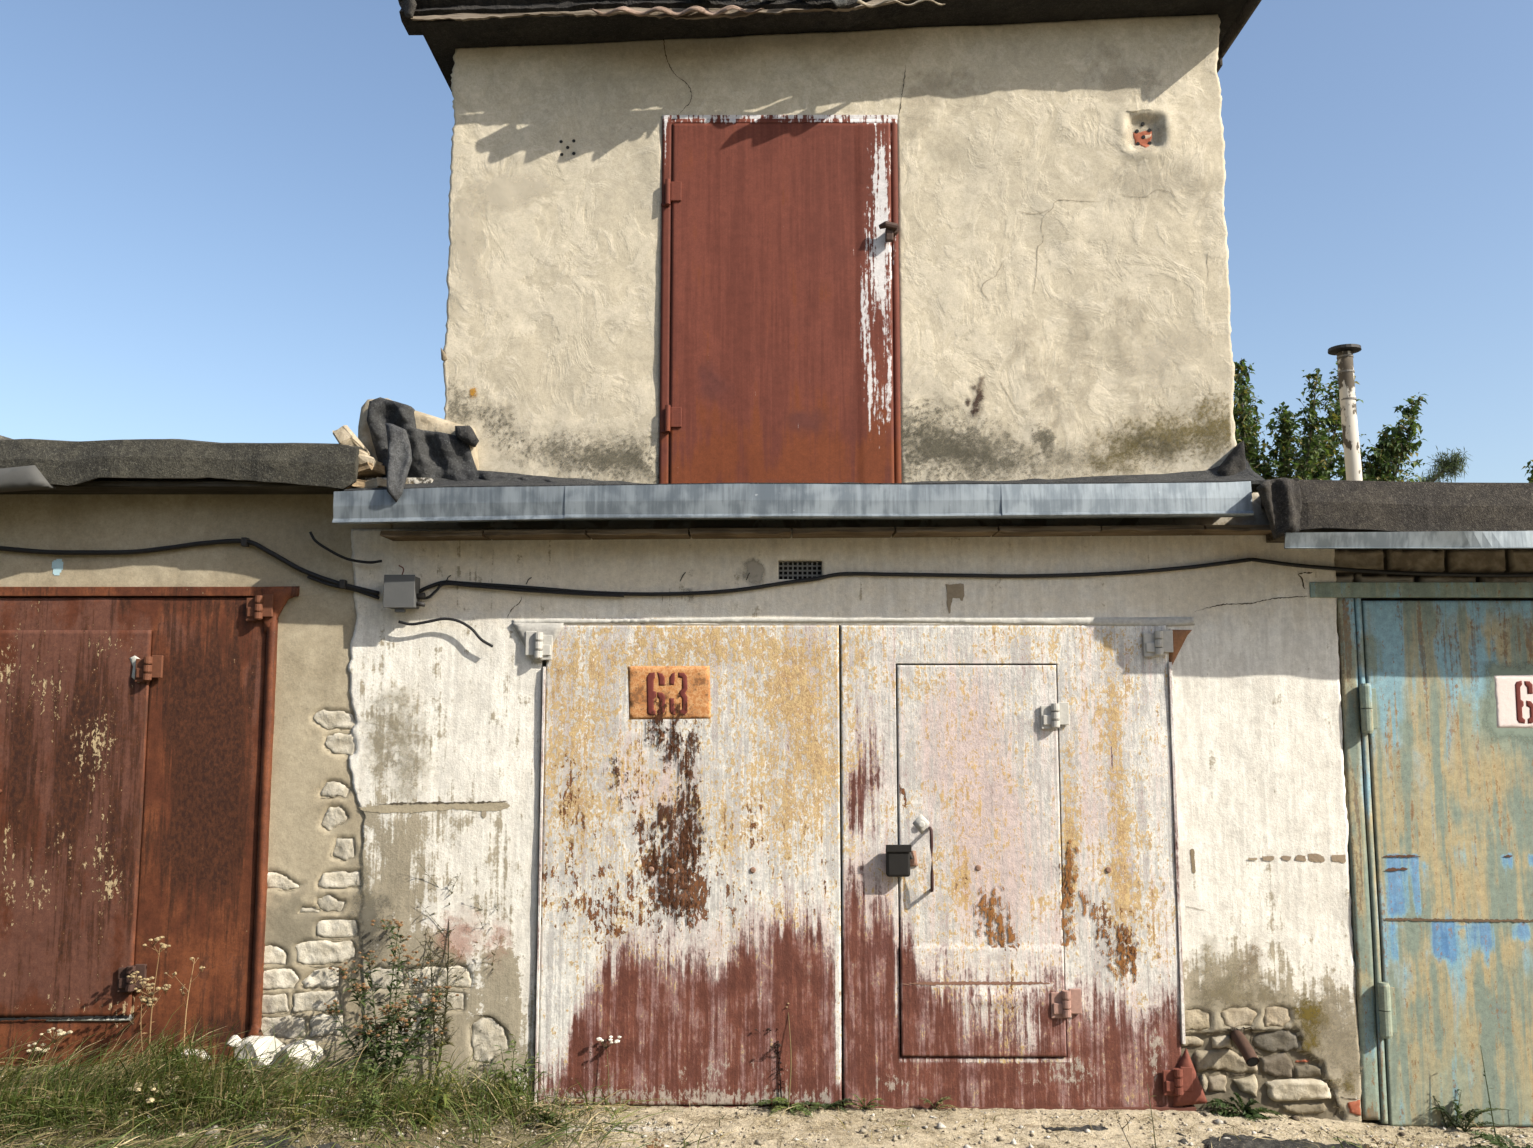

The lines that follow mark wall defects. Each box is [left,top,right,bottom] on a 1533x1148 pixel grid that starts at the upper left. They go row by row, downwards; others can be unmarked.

leakage [448,377,658,482]
leakage [901,376,1056,481]
flaking render [312,709,356,756]
corrosion [603,694,711,926]
flaking render [261,781,510,1040]
corrosion [973,885,1020,948]
corrosion [1056,839,1147,986]
flaking render [367,965,508,1063]
leakage [1195,944,1285,1010]
flaking render [1181,1005,1361,1121]